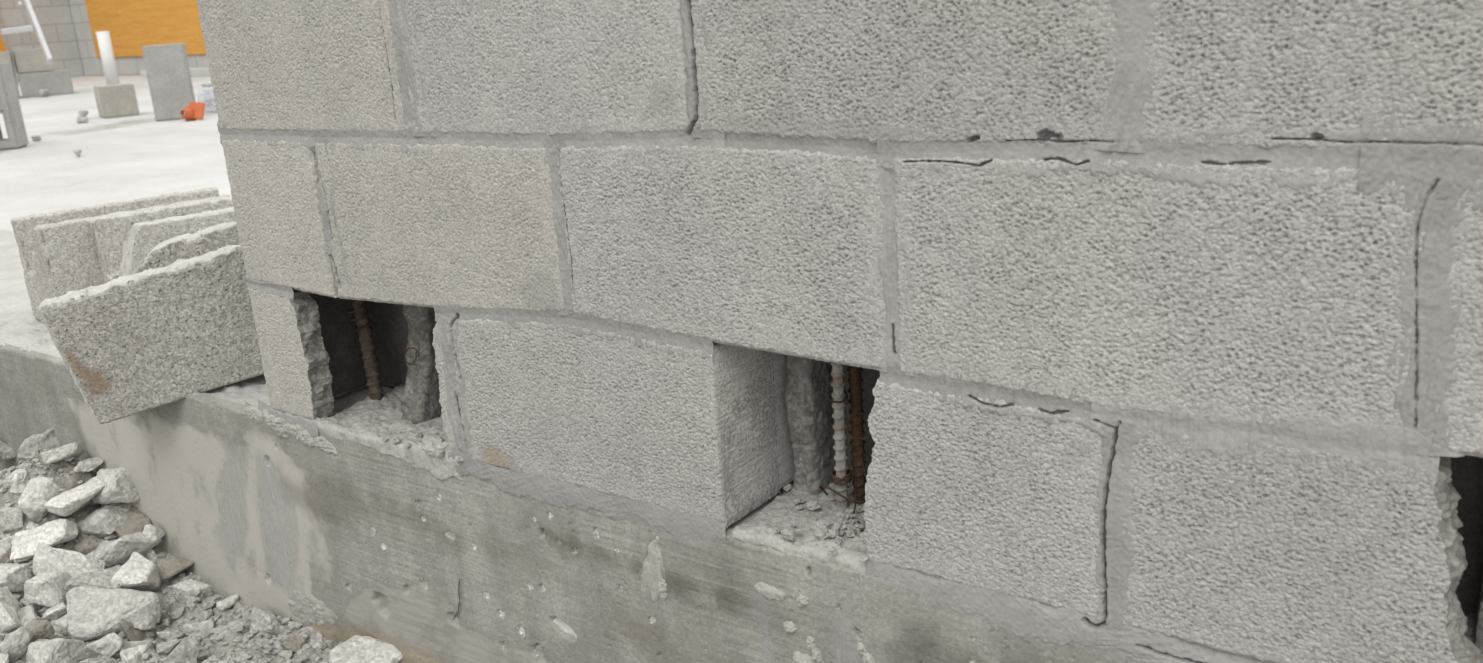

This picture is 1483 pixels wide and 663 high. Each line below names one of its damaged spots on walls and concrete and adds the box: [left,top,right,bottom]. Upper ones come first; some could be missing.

crack [905,139,1100,166]
crack [1203,138,1403,165]
spalling [245,291,463,522]
spalling [730,355,872,587]
crack [970,396,1119,428]
crack [1412,223,1420,421]
spalling [1434,456,1483,663]